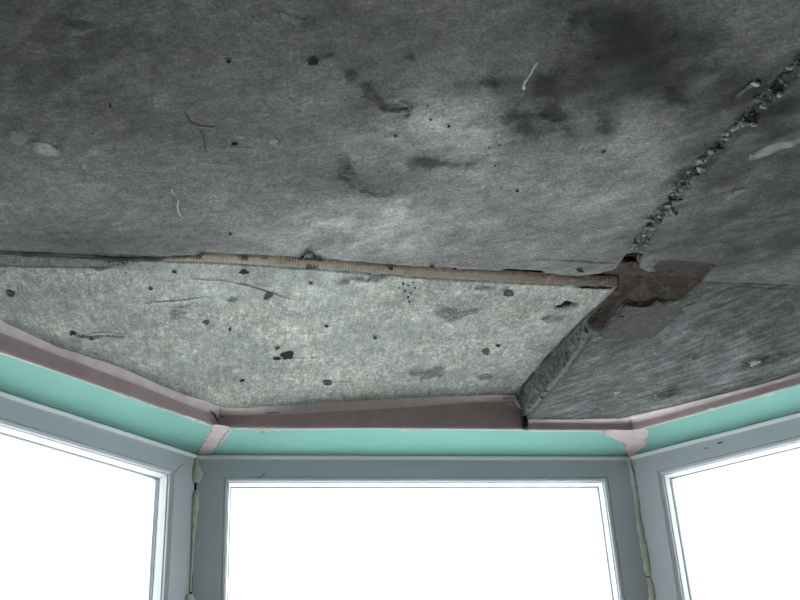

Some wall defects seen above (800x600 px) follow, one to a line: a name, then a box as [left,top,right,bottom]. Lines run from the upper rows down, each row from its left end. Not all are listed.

corrosion [580,257,711,329]